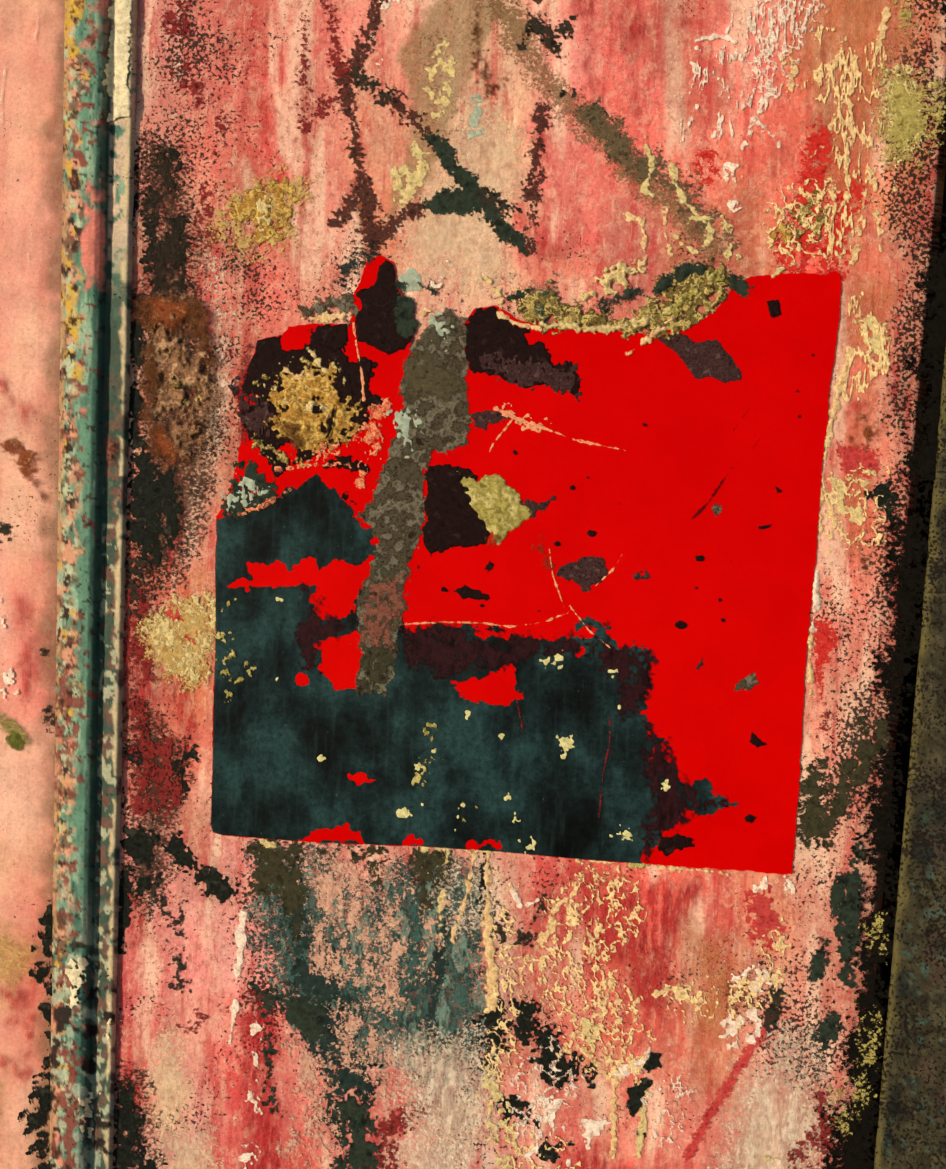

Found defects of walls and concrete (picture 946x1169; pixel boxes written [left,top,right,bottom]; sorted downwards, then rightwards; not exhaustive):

peeling [102,0,135,122]
peeling [464,135,754,402]
rust [135,295,216,365]
rust [140,344,177,462]
peeling [118,243,792,1169]
peeling [783,874,795,894]
peeling [17,900,94,1169]